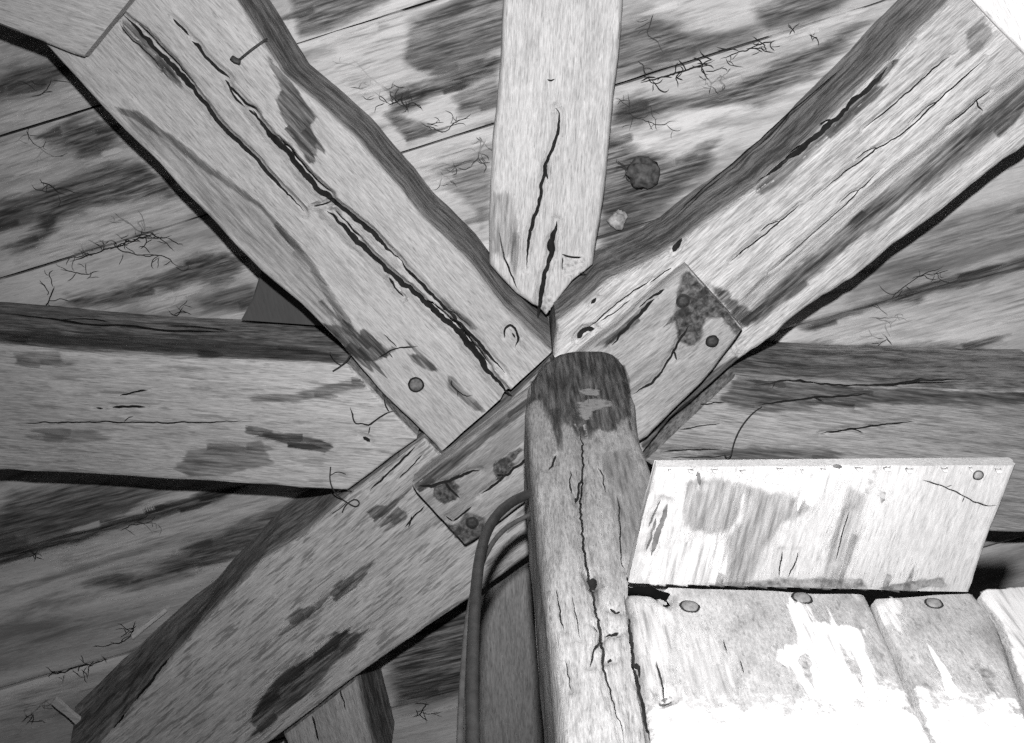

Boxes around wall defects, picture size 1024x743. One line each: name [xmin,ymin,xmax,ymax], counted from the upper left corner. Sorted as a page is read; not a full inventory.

crack [121,14,512,396]
crack [499,108,587,318]
crack [672,56,989,271]
leakage [367,314,639,530]
crack [549,433,665,742]
peeling [781,596,875,716]
peeling [927,644,962,698]
peeling [982,588,1024,679]